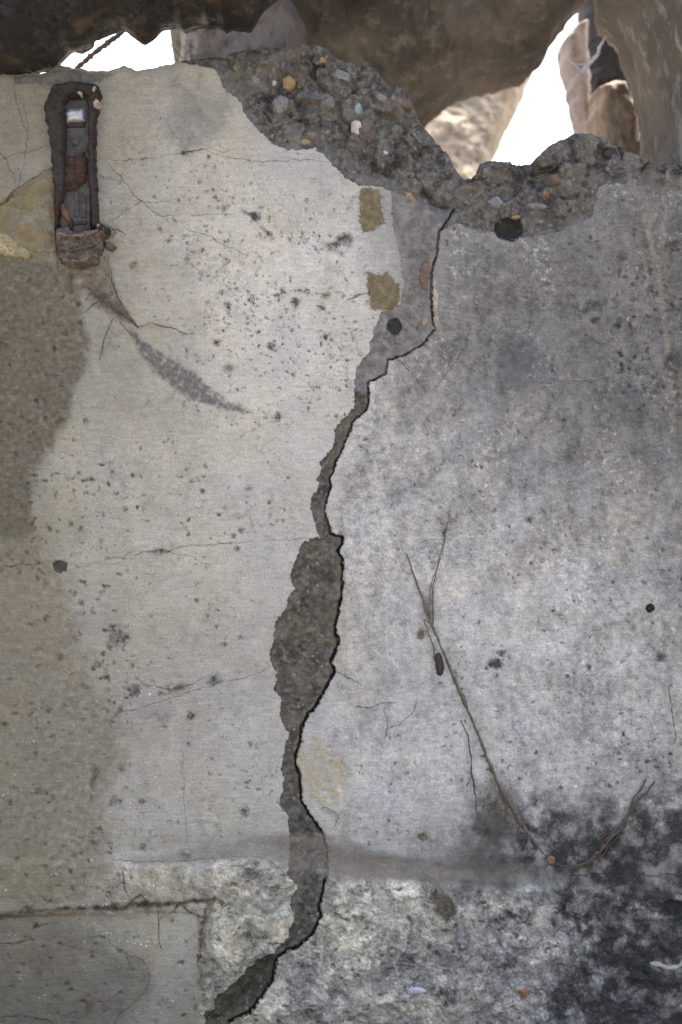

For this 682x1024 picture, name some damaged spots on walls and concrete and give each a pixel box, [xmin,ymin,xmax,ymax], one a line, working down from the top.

leakage [0,182,87,536]
corrosion [53,151,88,256]
crack [229,207,464,1022]
spalling [182,44,682,1024]
leakage [463,796,682,1024]